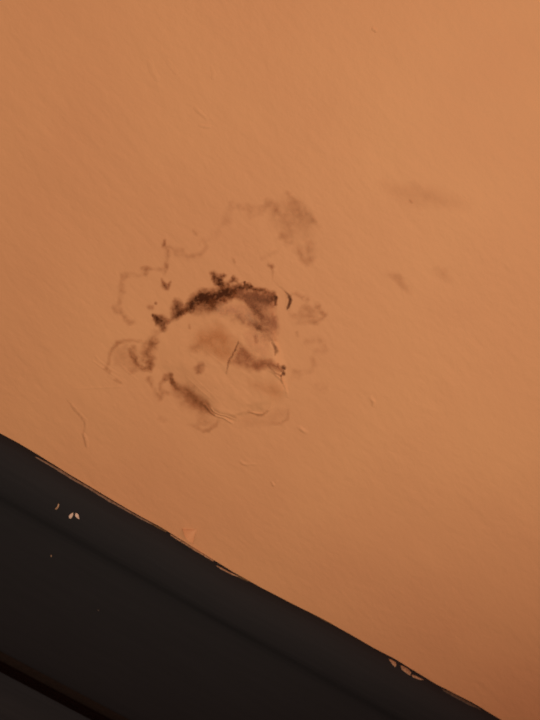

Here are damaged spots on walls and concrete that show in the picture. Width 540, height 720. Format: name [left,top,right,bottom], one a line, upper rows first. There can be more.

mould [152,314,165,330]
leakage [173,273,277,330]
peeling [36,457,248,581]